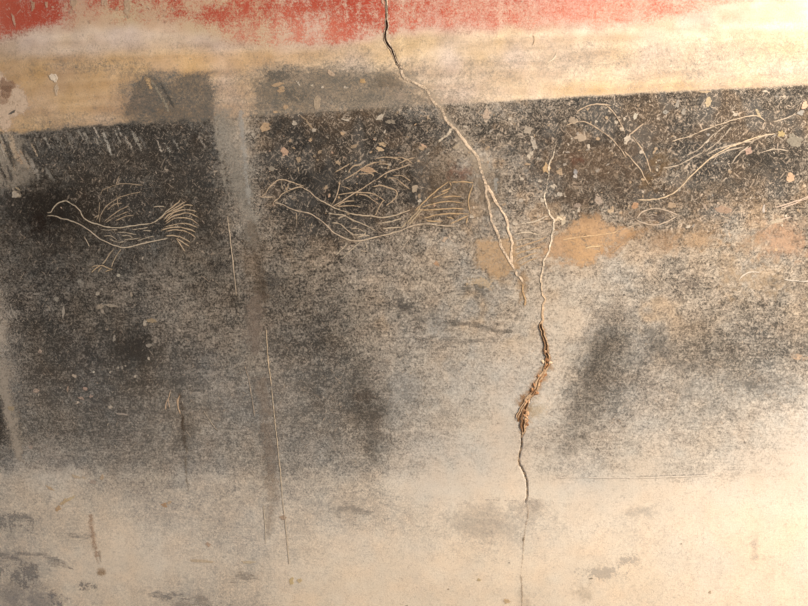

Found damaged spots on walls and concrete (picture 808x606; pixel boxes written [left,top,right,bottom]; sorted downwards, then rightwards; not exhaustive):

crack [381,0,565,437]
leakage [545,214,640,266]
leakage [0,353,23,460]